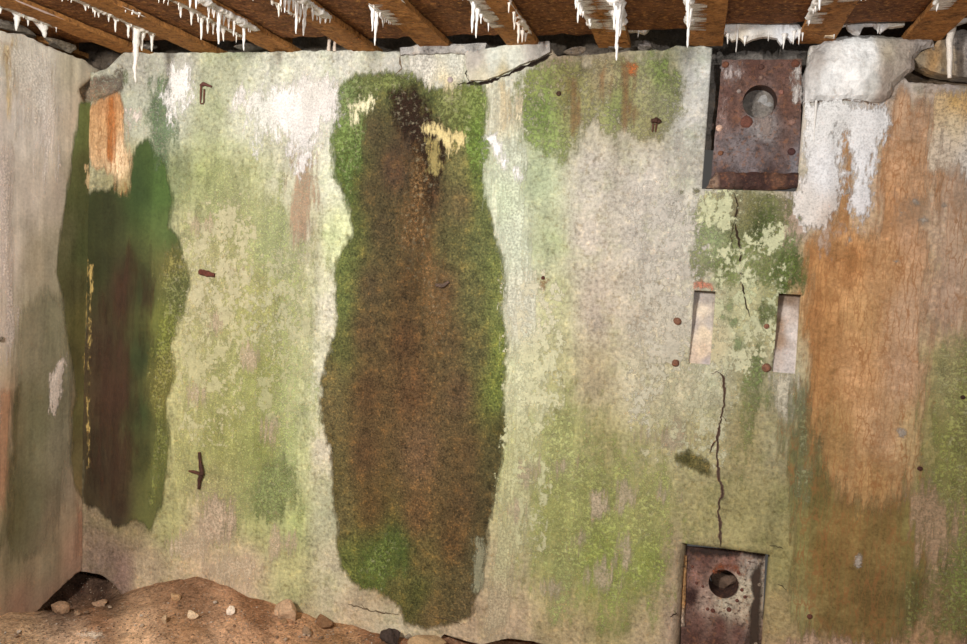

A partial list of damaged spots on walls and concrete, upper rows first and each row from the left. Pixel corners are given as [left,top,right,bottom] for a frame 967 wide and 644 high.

leakage [368,4,397,46]
leakage [575,0,628,61]
leakage [683,0,707,48]
leakage [804,0,862,25]
rust [89,91,132,195]
leakage [784,99,892,256]
leakage [0,0,346,530]
crack [730,194,750,316]
rust [803,85,945,512]
crack [710,371,726,545]
leakage [768,373,929,644]
rust [686,547,764,644]